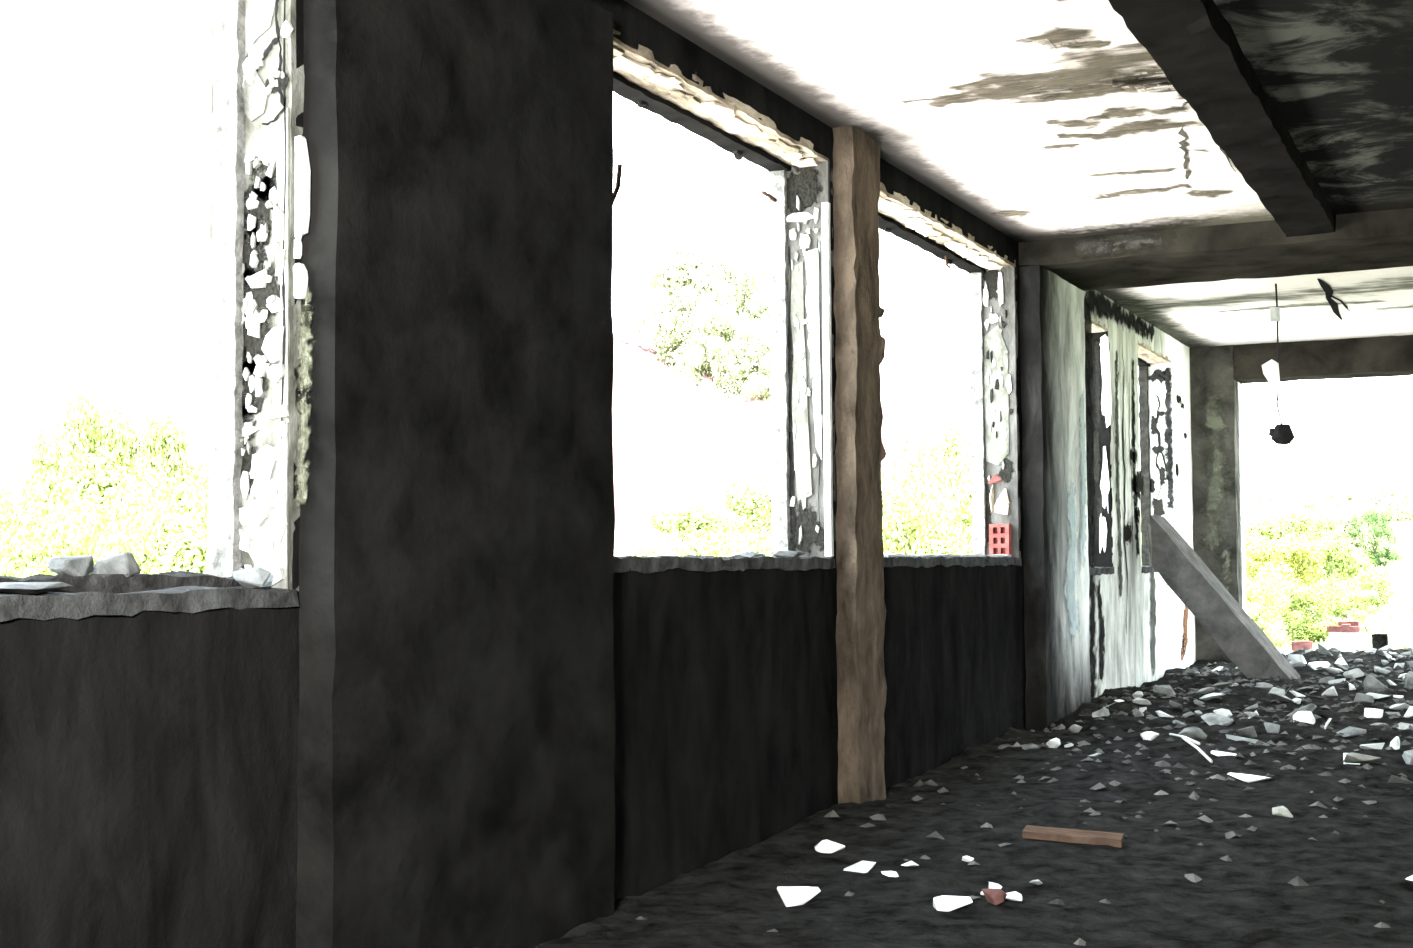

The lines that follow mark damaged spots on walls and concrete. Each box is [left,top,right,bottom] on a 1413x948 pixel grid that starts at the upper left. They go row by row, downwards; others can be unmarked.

leakage [900,28,1203,149]
leakage [1078,168,1233,200]
peeling [239,0,312,589]
peeling [613,46,825,556]
peeling [878,196,1014,543]
peeling [1093,335,1111,552]
spalling [1124,394,1184,546]